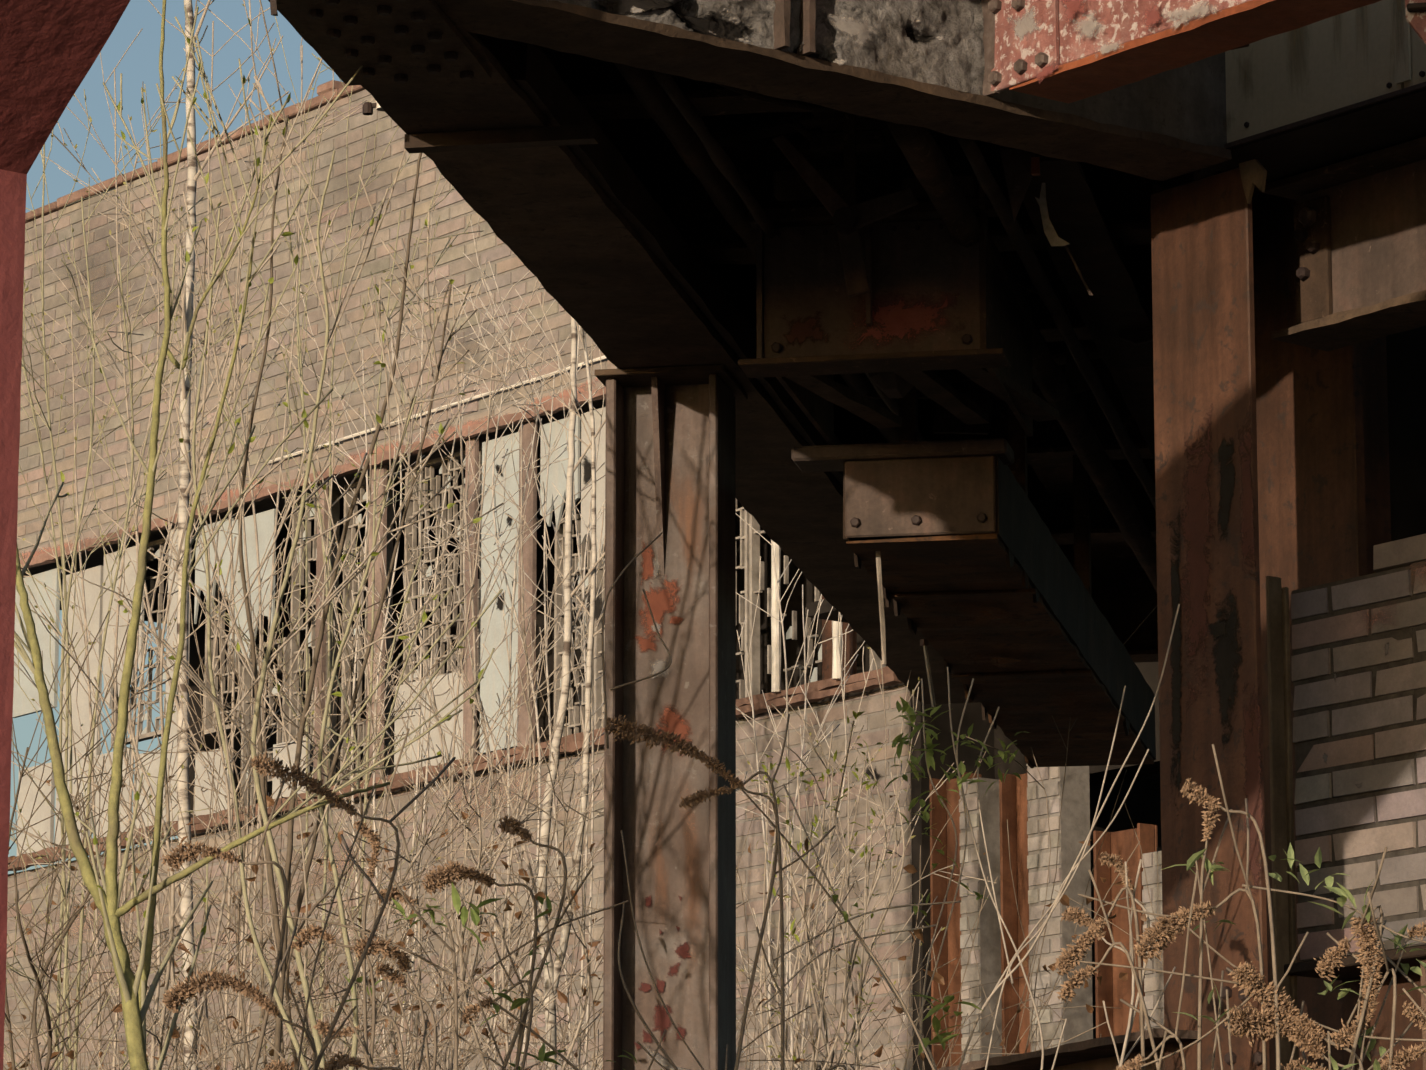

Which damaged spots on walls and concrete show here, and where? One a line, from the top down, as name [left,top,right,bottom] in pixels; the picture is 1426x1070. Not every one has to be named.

peeling [1009,7,1039,40]
peeling [1076,14,1119,54]
peeling [1164,0,1213,29]
corrosion [654,706,692,757]